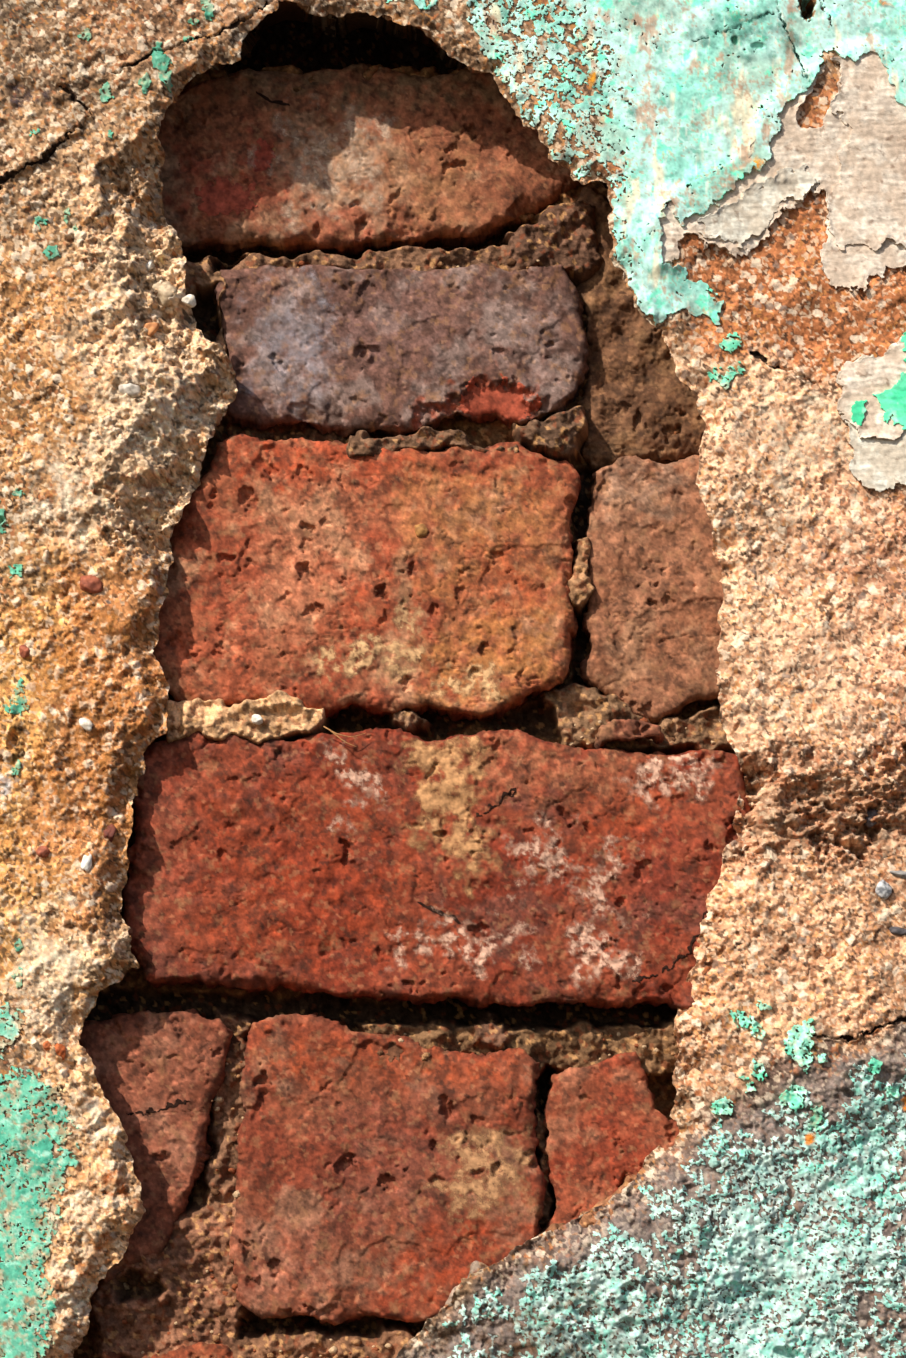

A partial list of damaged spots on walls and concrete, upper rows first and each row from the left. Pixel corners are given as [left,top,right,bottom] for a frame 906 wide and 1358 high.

peeling [99,82,115,103]
peeling [138,41,173,94]
crack [111,1,268,74]
peeling [183,0,215,42]
peeling [386,0,437,10]
crack [0,85,88,190]
peeling [466,0,906,390]
spalling [455,373,542,420]
peeling [835,332,906,493]
spalling [85,447,177,536]
peeling [729,1000,772,1040]
peeling [442,1018,906,1358]